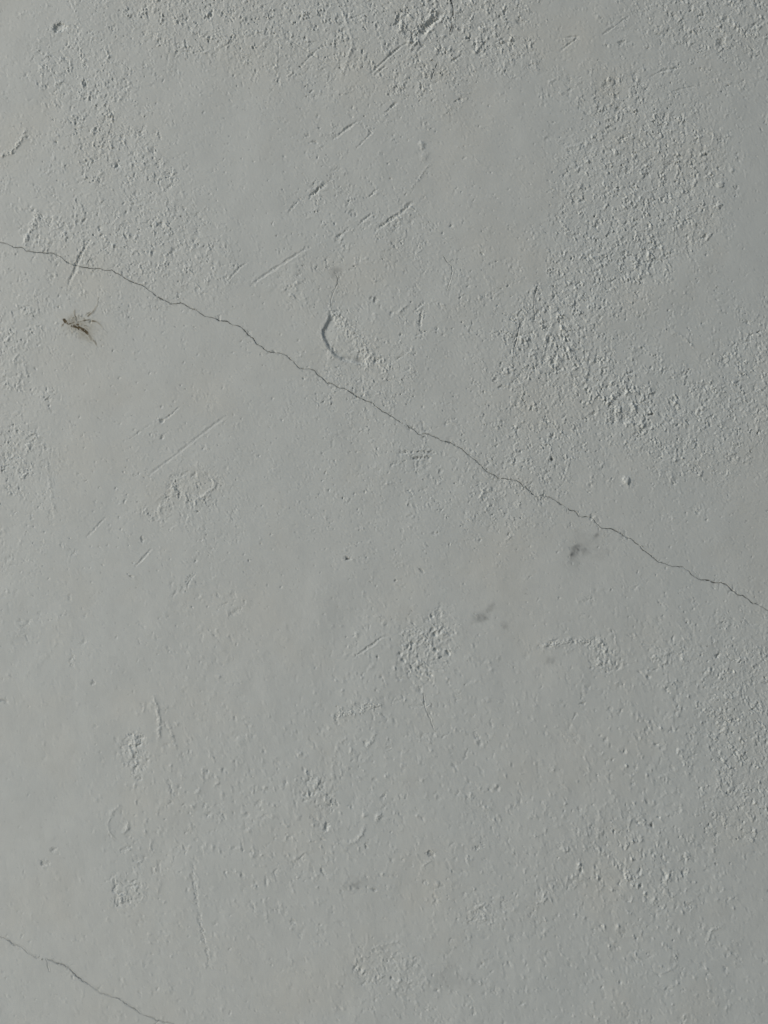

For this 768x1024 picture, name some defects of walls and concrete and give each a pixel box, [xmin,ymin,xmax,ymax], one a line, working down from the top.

crack [0,241,768,612]
crack [0,936,176,1024]